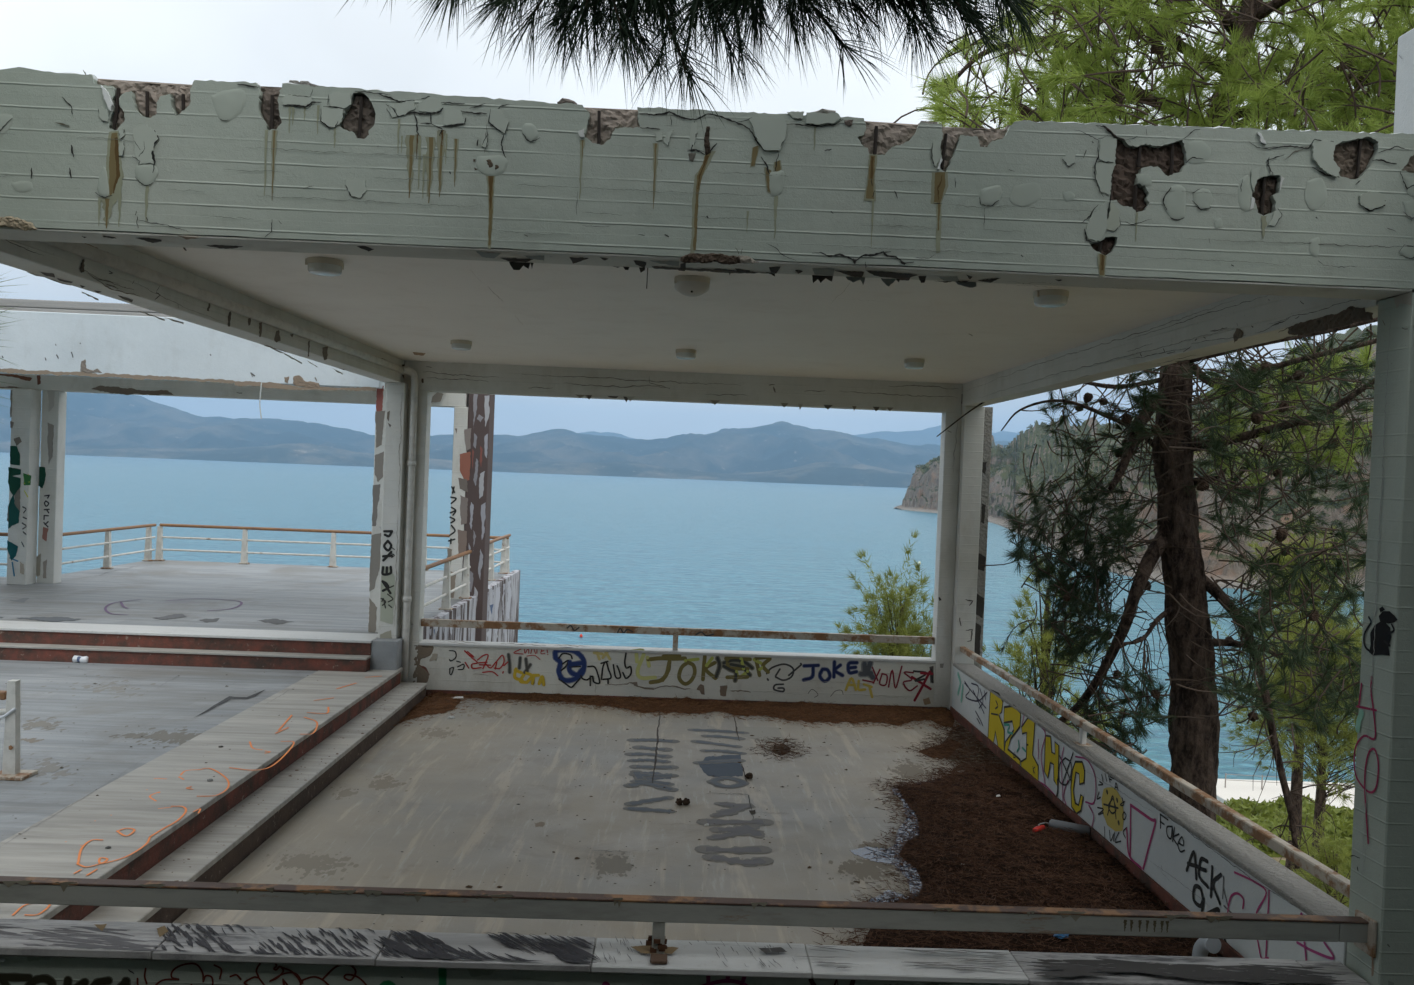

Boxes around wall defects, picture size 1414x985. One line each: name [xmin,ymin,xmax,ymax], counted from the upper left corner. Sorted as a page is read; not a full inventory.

corrosion [98,131,124,228]
spalling [97,79,192,165]
spalling [261,86,464,139]
corrosion [397,119,459,203]
spalling [578,107,673,145]
corrosion [690,151,716,253]
spalling [750,111,918,155]
corrosion [930,172,948,253]
spalling [1086,125,1184,255]
spalling [1311,139,1374,179]
spalling [570,253,1000,288]
crack [50,90,1414,902]